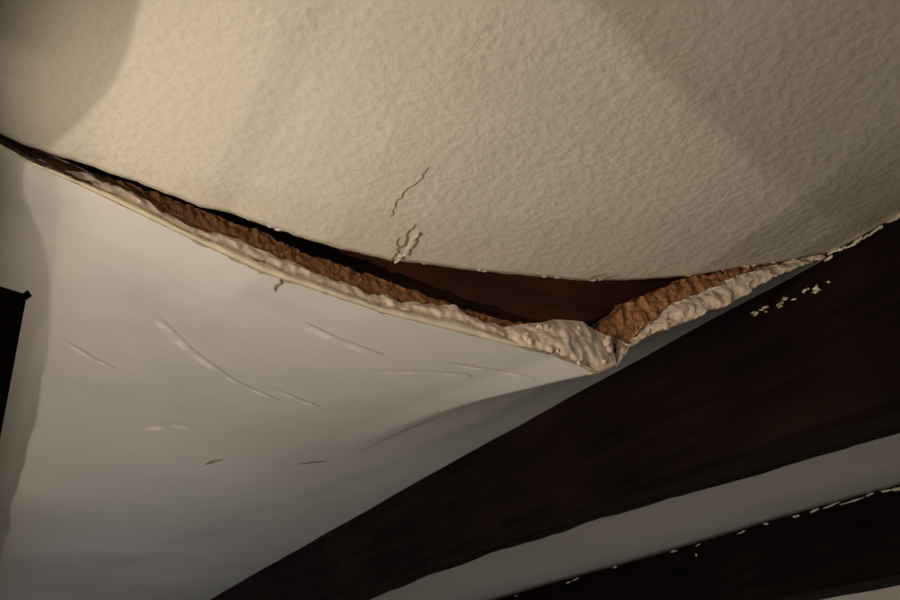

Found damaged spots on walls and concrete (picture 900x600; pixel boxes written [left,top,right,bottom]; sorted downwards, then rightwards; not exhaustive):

crack [390,167,429,263]
spalling [0,144,900,375]